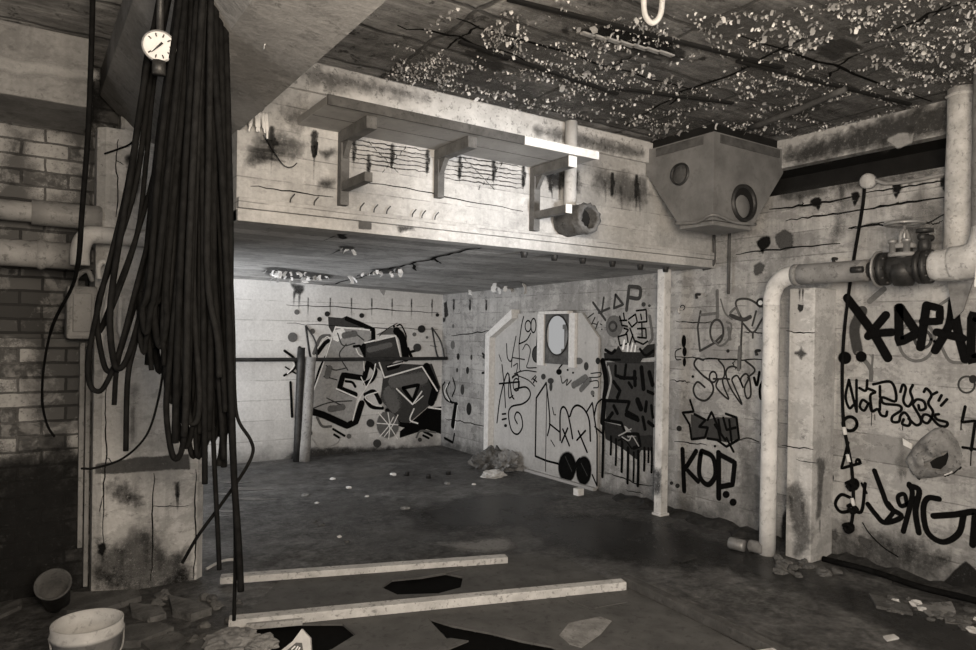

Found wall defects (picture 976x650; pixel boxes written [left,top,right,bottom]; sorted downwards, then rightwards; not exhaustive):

spalling [385,0,976,141]
crack [397,0,975,126]
crack [114,139,122,215]
crack [150,472,197,581]